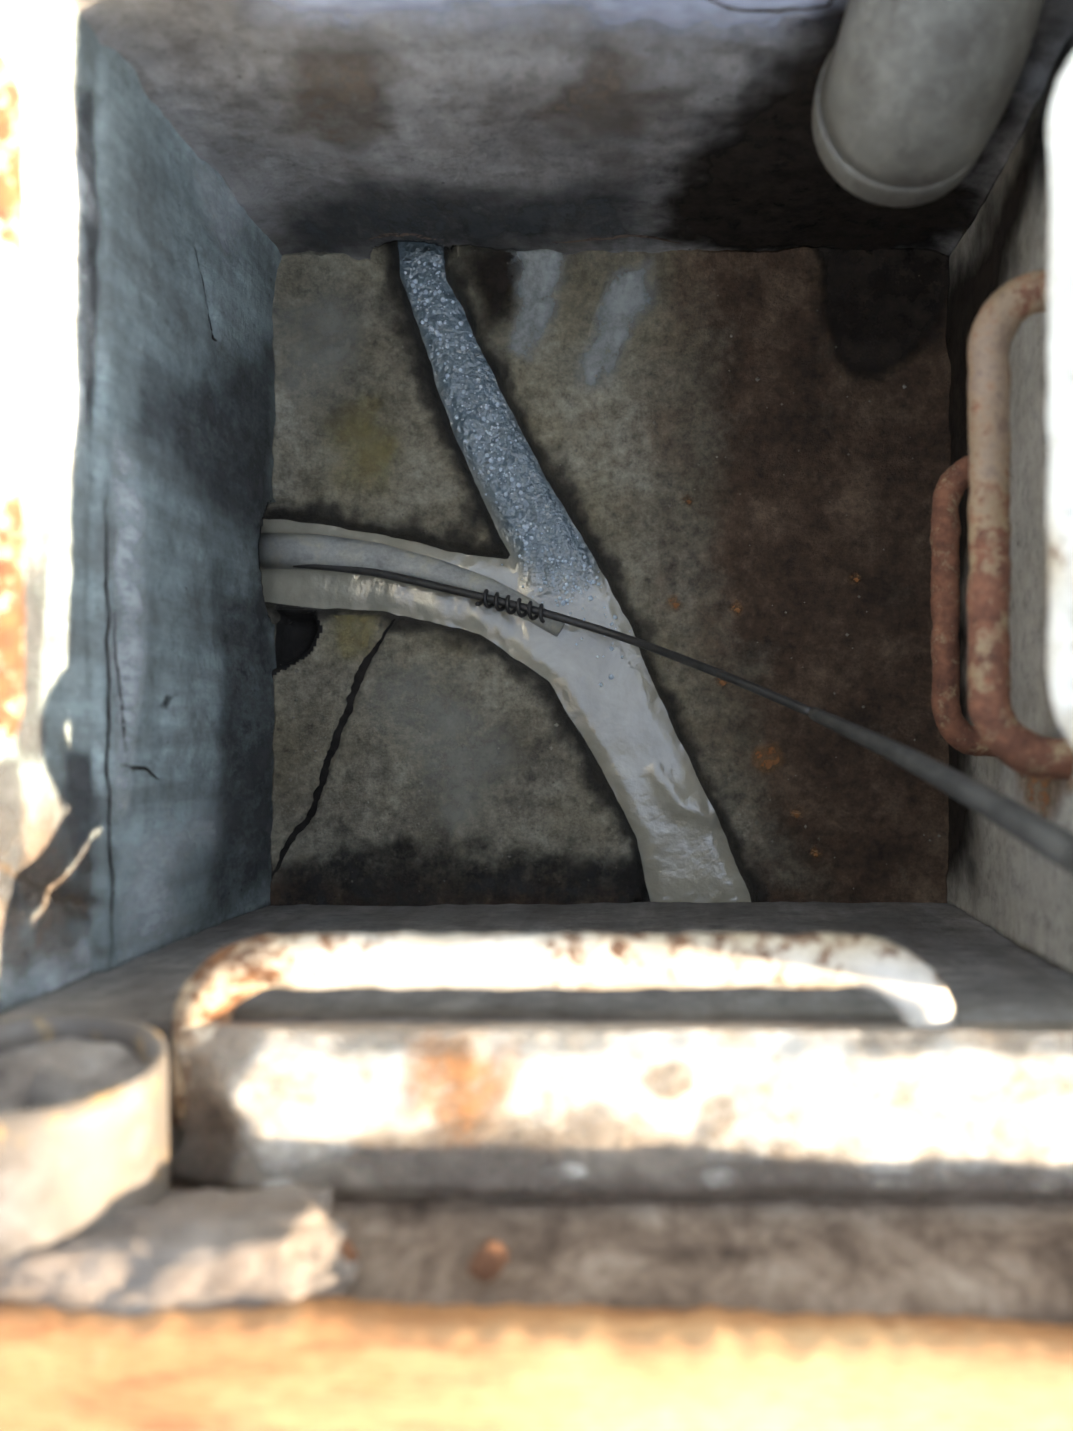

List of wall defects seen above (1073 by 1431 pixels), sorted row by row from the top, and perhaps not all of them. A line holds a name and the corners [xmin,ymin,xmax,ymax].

crack [708,0,834,13]
water stain [657,0,1070,465]
hole [272,605,323,678]
water stain [958,487,970,722]
crack [271,618,396,879]
water stain [948,744,969,776]
water stain [946,796,974,877]